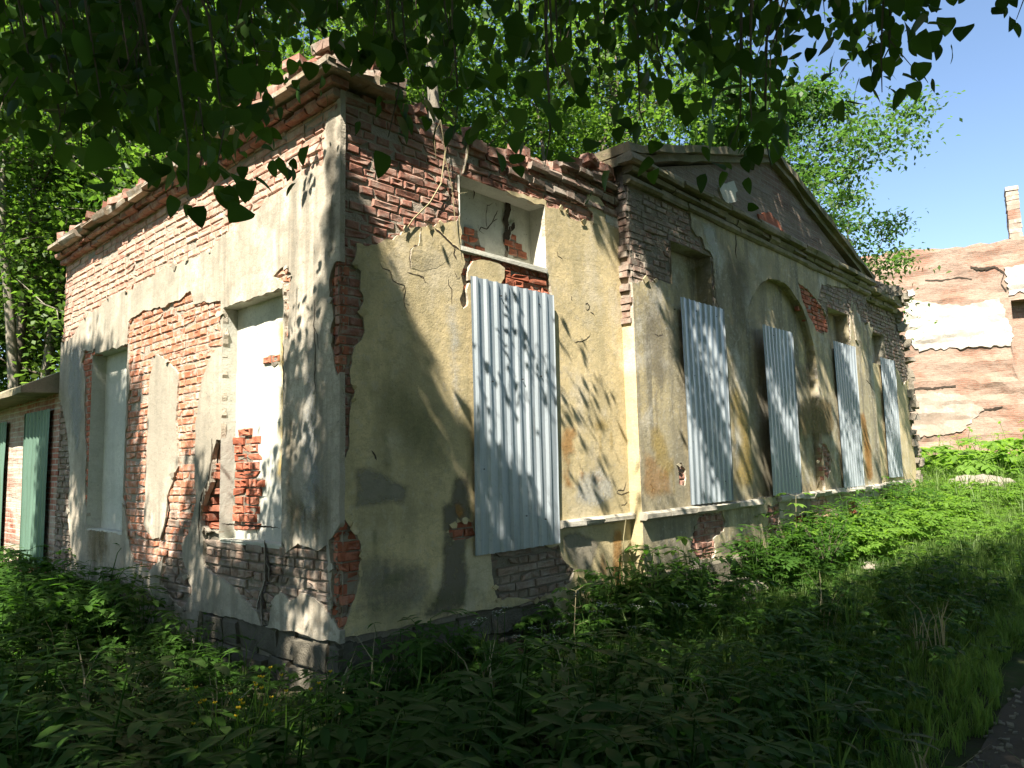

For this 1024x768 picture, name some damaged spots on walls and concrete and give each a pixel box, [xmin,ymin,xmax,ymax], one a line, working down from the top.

peeling [62,91,716,454]
peeling [794,284,908,385]
spalling [122,292,371,630]
spalling [491,546,573,607]
spalling [691,511,723,559]